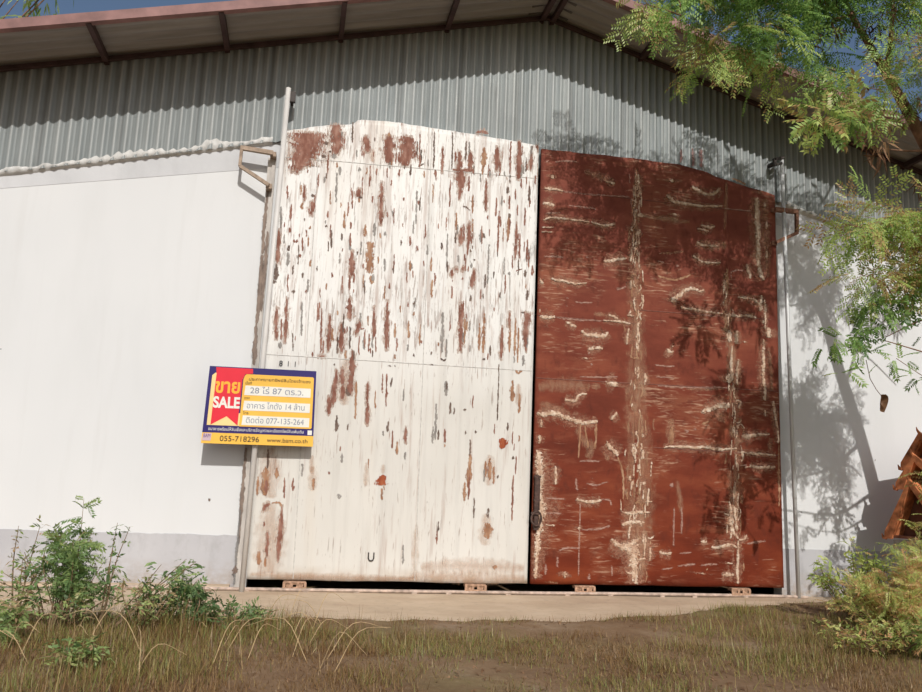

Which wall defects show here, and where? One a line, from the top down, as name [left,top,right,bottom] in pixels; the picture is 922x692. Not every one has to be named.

rust [273,122,539,521]
rust [256,449,315,567]
rust [482,508,494,539]